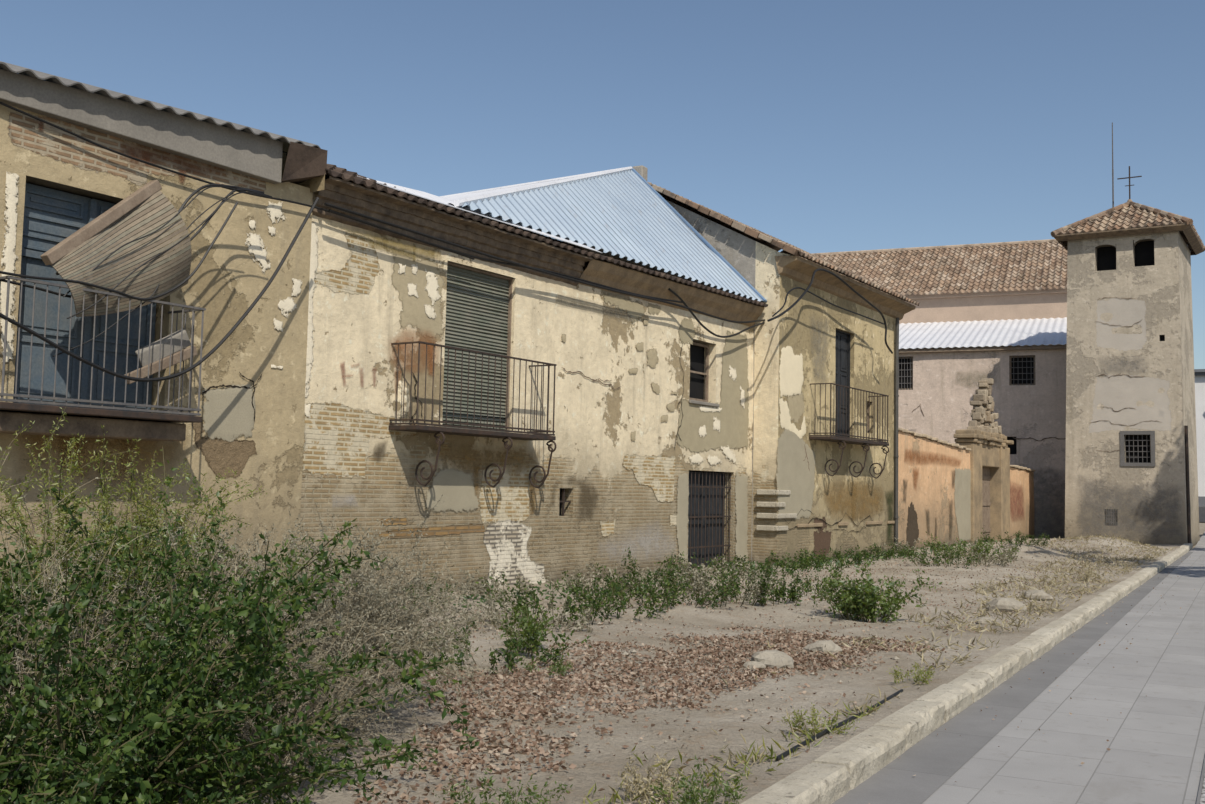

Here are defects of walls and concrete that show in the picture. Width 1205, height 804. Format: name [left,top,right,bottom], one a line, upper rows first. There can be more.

flaking render [8,112,285,273]
flaking render [273,278,302,332]
flaking render [391,249,446,339]
crack [1095,297,1140,327]
flaking render [192,420,257,479]
crack [202,372,262,421]
crack [563,368,621,390]
peeling [779,397,806,439]
crack [1091,407,1159,452]
peeling [522,559,546,584]